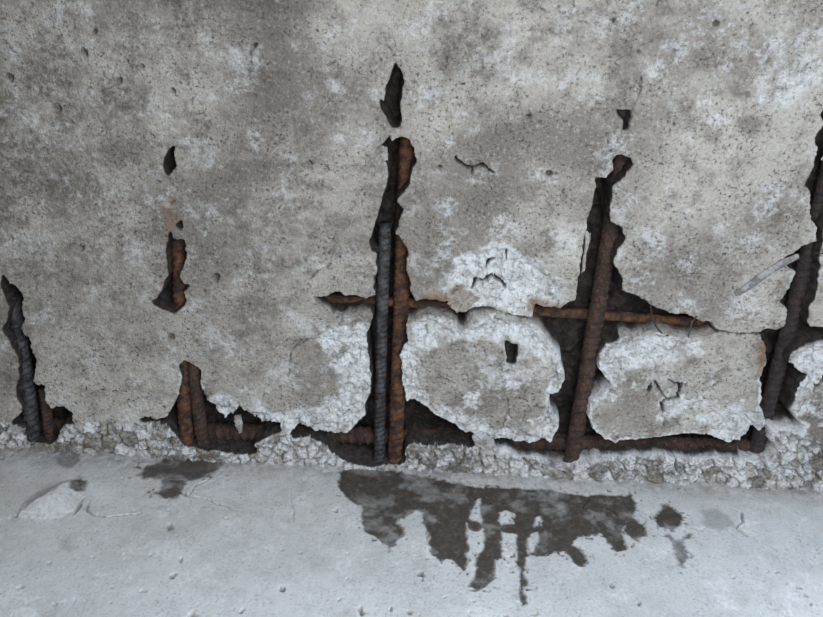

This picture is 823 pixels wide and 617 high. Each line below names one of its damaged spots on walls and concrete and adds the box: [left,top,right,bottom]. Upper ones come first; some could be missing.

spalling [0,62,823,492]
rust [417,289,448,302]
crack [812,375,823,394]
leakage [125,457,235,507]
leakage [329,465,738,611]